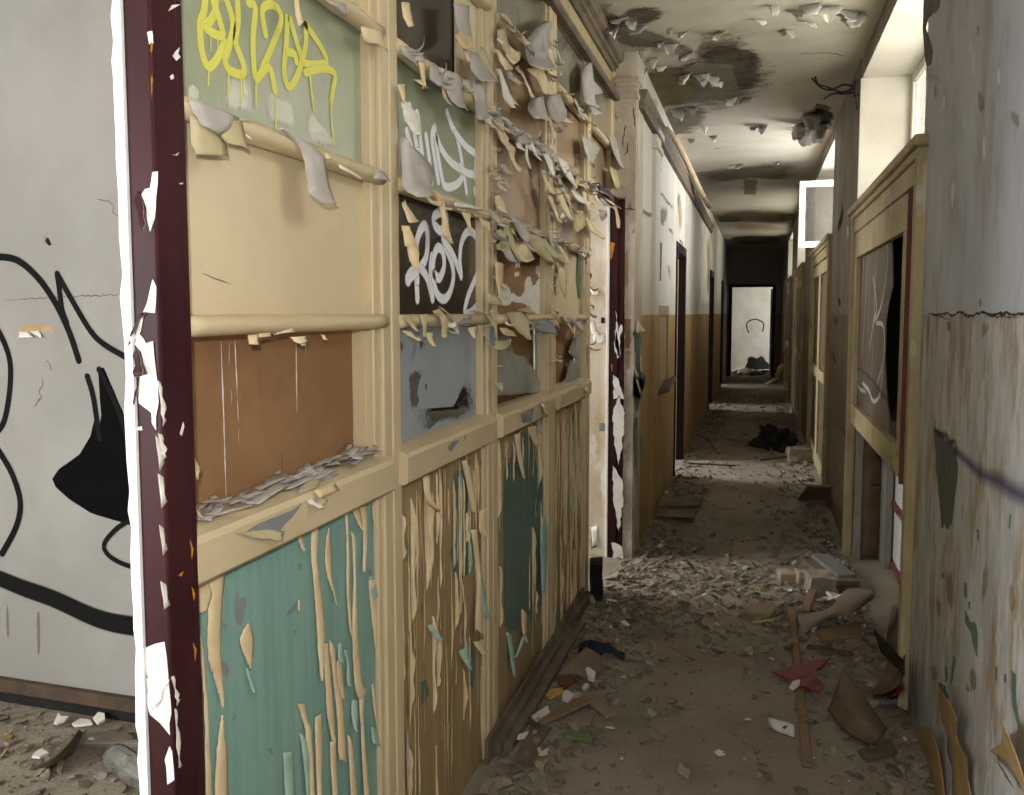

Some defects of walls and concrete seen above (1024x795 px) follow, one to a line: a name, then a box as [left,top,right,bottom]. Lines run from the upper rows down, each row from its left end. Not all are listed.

water stain [602,7,776,134]
flaking render [791,104,834,147]
peeling [128,279,167,508]
peeling [248,328,307,346]
peeling [277,0,647,530]
crack [928,310,1024,334]
peeling [159,525,168,555]
peeling [145,642,182,785]
peeling [160,581,170,609]
peeling [192,574,229,795]
peeling [283,502,385,795]
peeling [402,402,598,795]